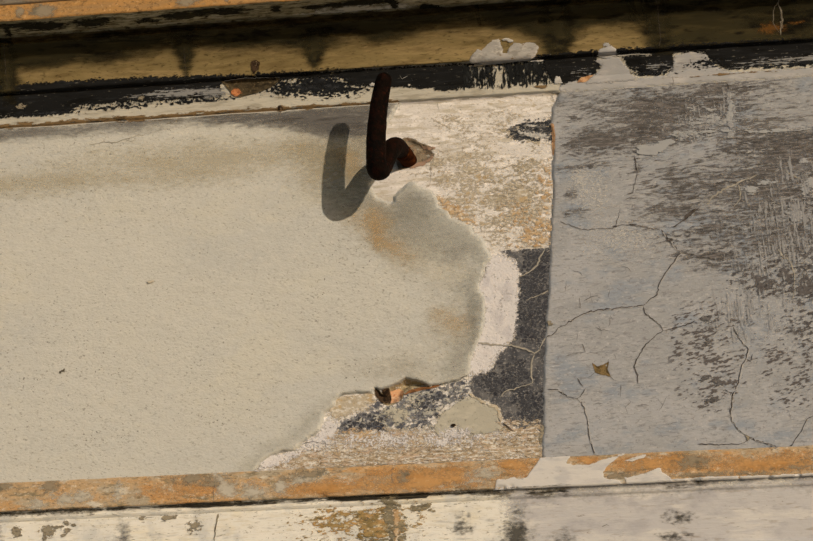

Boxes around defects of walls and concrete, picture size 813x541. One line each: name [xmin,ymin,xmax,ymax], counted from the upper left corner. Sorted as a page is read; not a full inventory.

damp [175,35,194,73]
peeling [0,49,600,130]
damp [300,28,329,66]
crack [726,84,754,155]
damp [762,0,813,33]
peeling [396,36,813,411]
crack [478,175,757,454]
crack [700,315,810,449]
peeling [254,358,544,493]
peeling [37,521,76,541]
peeling [213,472,265,498]
peeling [286,495,435,541]